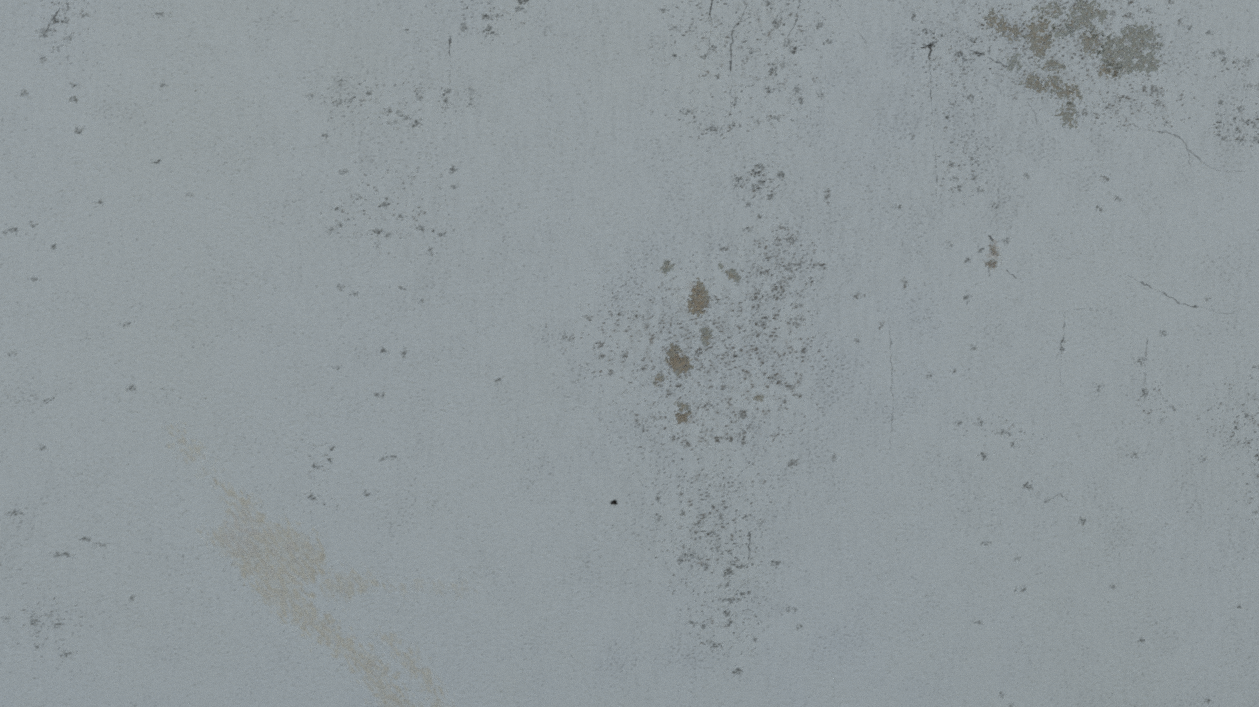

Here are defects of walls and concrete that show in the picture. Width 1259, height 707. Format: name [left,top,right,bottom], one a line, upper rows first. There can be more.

peeling [984,0,1163,128]
spalling [688,278,712,345]
spalling [653,343,694,385]
spalling [676,403,691,424]